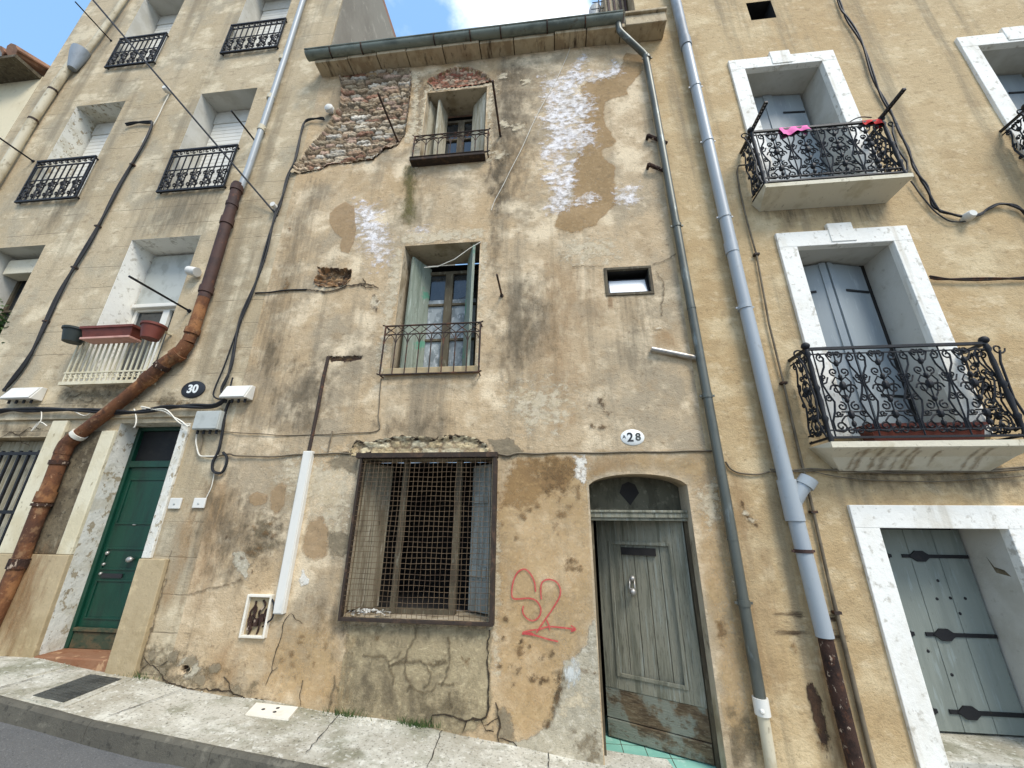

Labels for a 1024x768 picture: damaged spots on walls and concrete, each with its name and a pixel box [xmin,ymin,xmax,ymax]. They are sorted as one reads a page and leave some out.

flaking render [291,67,492,174]
leakage [490,53,643,232]
spalling [313,266,352,287]
efflorescence [352,198,390,266]
peeling [233,434,489,578]
leakage [497,456,580,519]
crack [139,550,303,700]
crack [329,623,517,747]